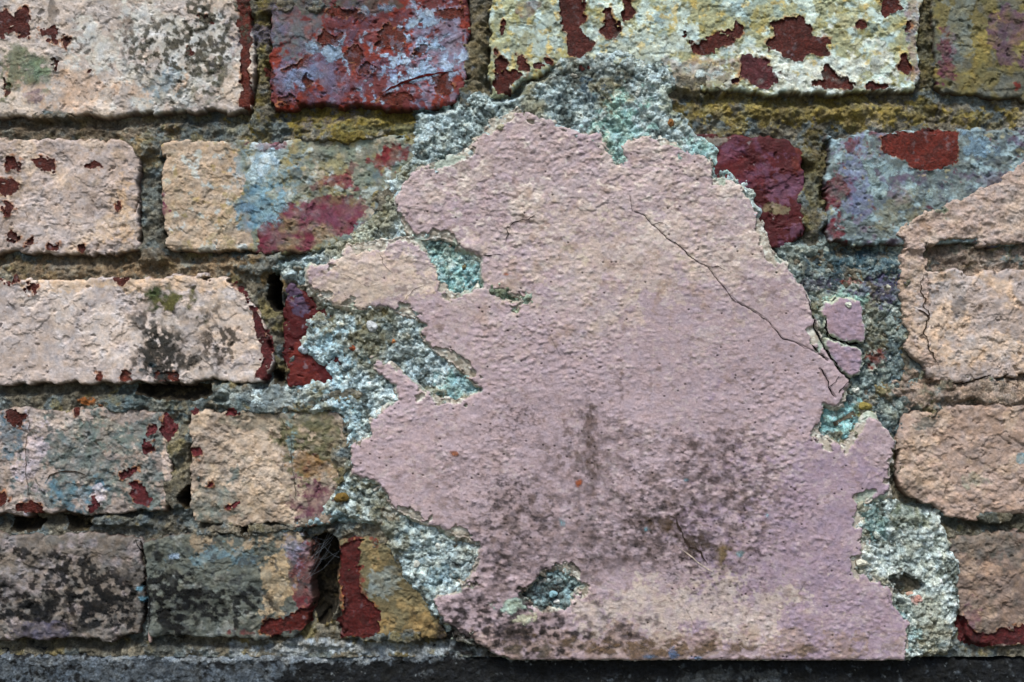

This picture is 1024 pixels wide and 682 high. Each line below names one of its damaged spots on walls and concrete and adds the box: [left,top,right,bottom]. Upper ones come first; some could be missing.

peeling [731,15,889,90]
peeling [880,0,912,32]
peeling [898,53,912,75]
peeling [0,155,55,217]
spalling [272,0,762,313]
peeling [881,127,959,171]
crack [630,199,863,397]
spalling [772,235,925,444]
crack [917,277,992,385]
spalling [233,281,481,638]
spalling [523,564,580,612]
spalling [852,498,1024,660]